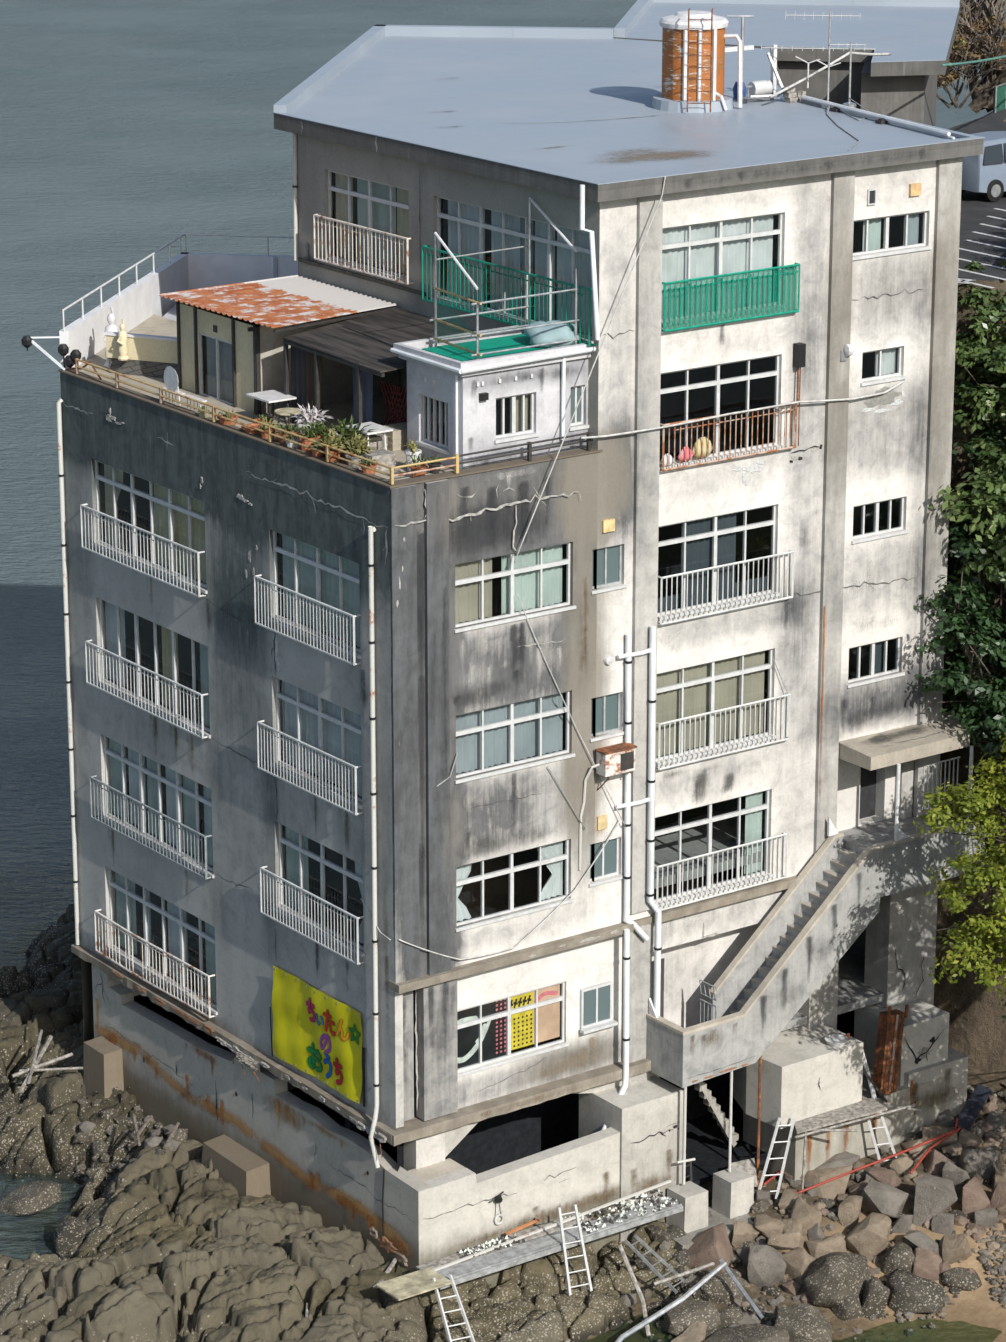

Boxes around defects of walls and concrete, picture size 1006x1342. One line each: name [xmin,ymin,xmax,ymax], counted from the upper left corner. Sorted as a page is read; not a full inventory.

water stain [620,151,703,161]
crack [246,471,581,564]
water stain [511,623,541,678]
crack [895,950,926,995]
rust [96,1001,409,1254]